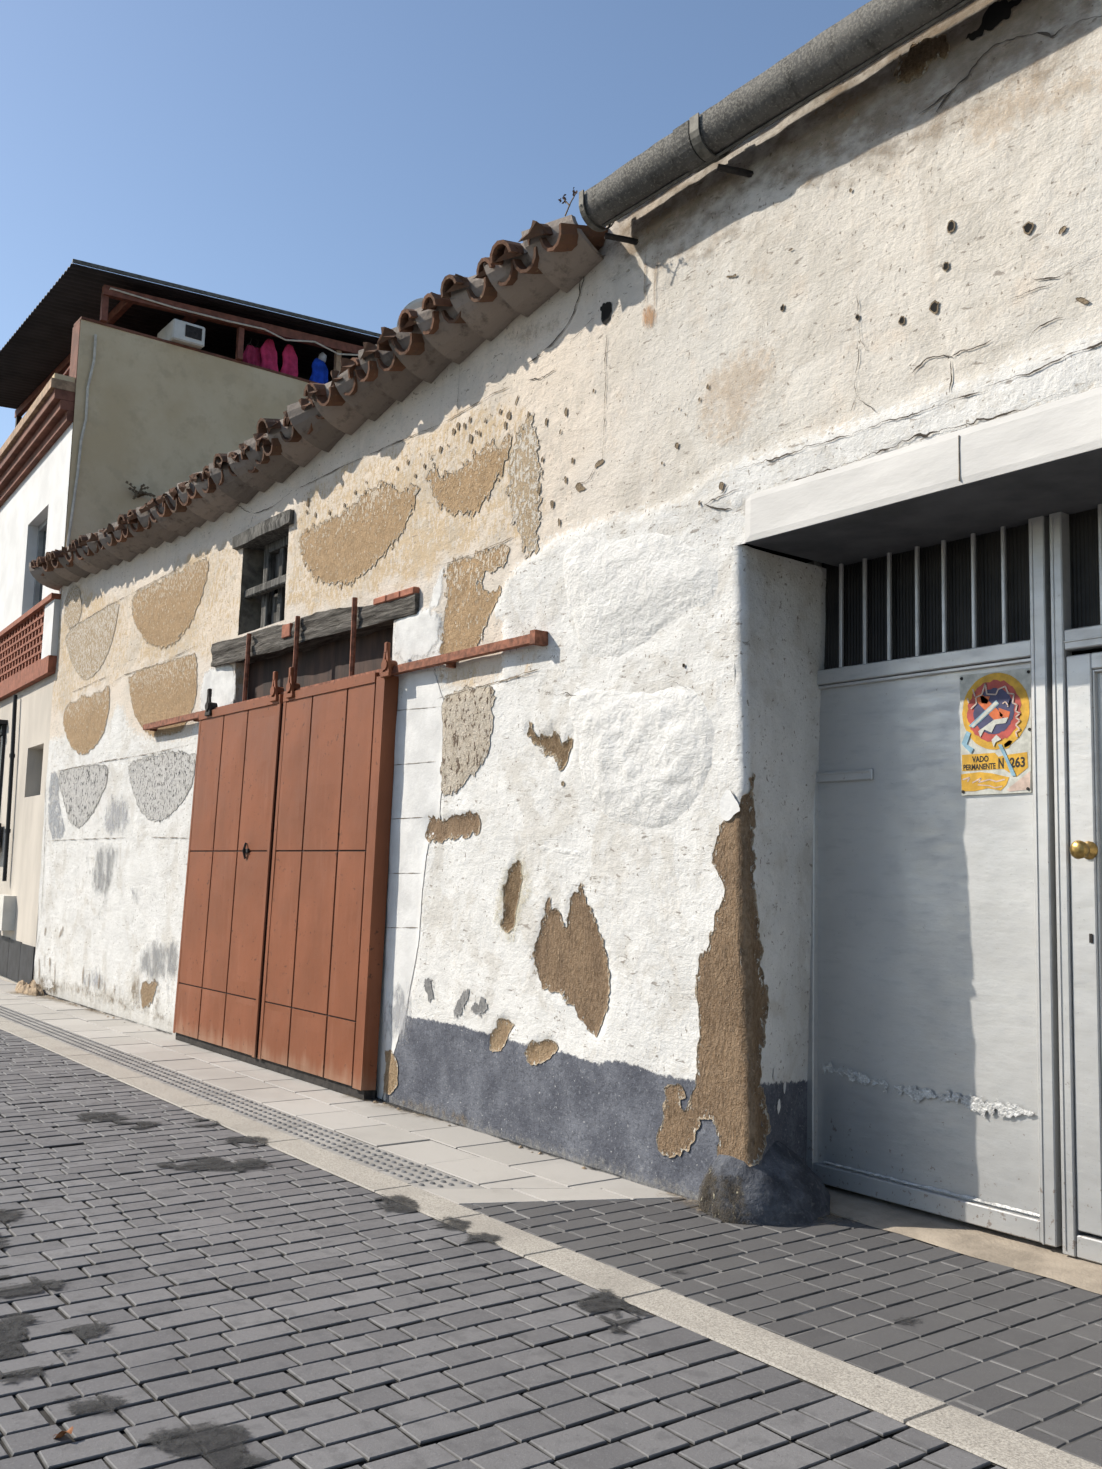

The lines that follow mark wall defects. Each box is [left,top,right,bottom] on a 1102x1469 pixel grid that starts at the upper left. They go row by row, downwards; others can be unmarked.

crack [919,16,1101,114]
crack [701,257,1102,511]
peeling [440,685,495,797]
spalling [527,721,573,786]
spalling [425,810,481,843]
spalling [500,860,522,933]
spalling [530,883,610,1037]
spalling [656,773,786,1225]
peeling [820,1059,1034,1118]
damp [155,1118,271,1171]
damp [0,1209,110,1382]
damp [138,1422,266,1469]